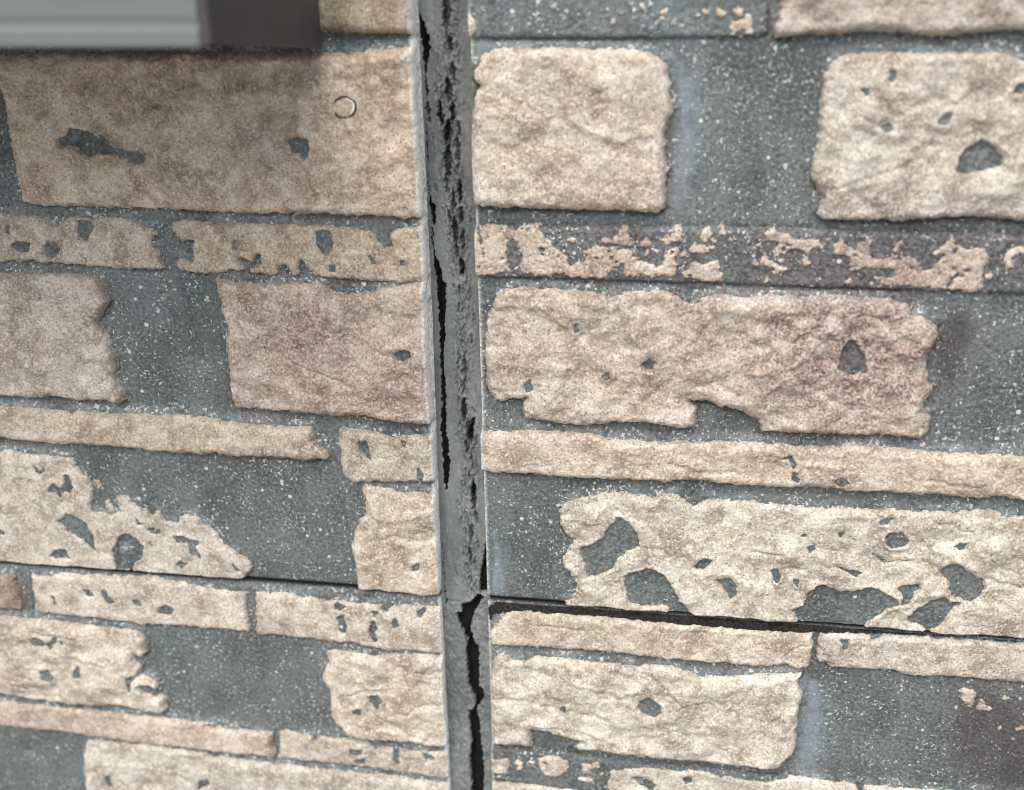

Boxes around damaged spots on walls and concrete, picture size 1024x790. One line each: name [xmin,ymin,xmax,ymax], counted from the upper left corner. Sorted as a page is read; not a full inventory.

crack [419,0,477,510]
peeling [474,222,1024,293]
spalling [49,475,73,498]
spalling [59,514,96,550]
spalling [112,518,161,570]
spalling [174,536,201,569]
spalling [581,517,640,577]
spalling [624,568,689,612]
spalling [695,559,712,569]
spalling [717,578,737,599]
spalling [770,564,984,630]
crack [442,543,487,790]